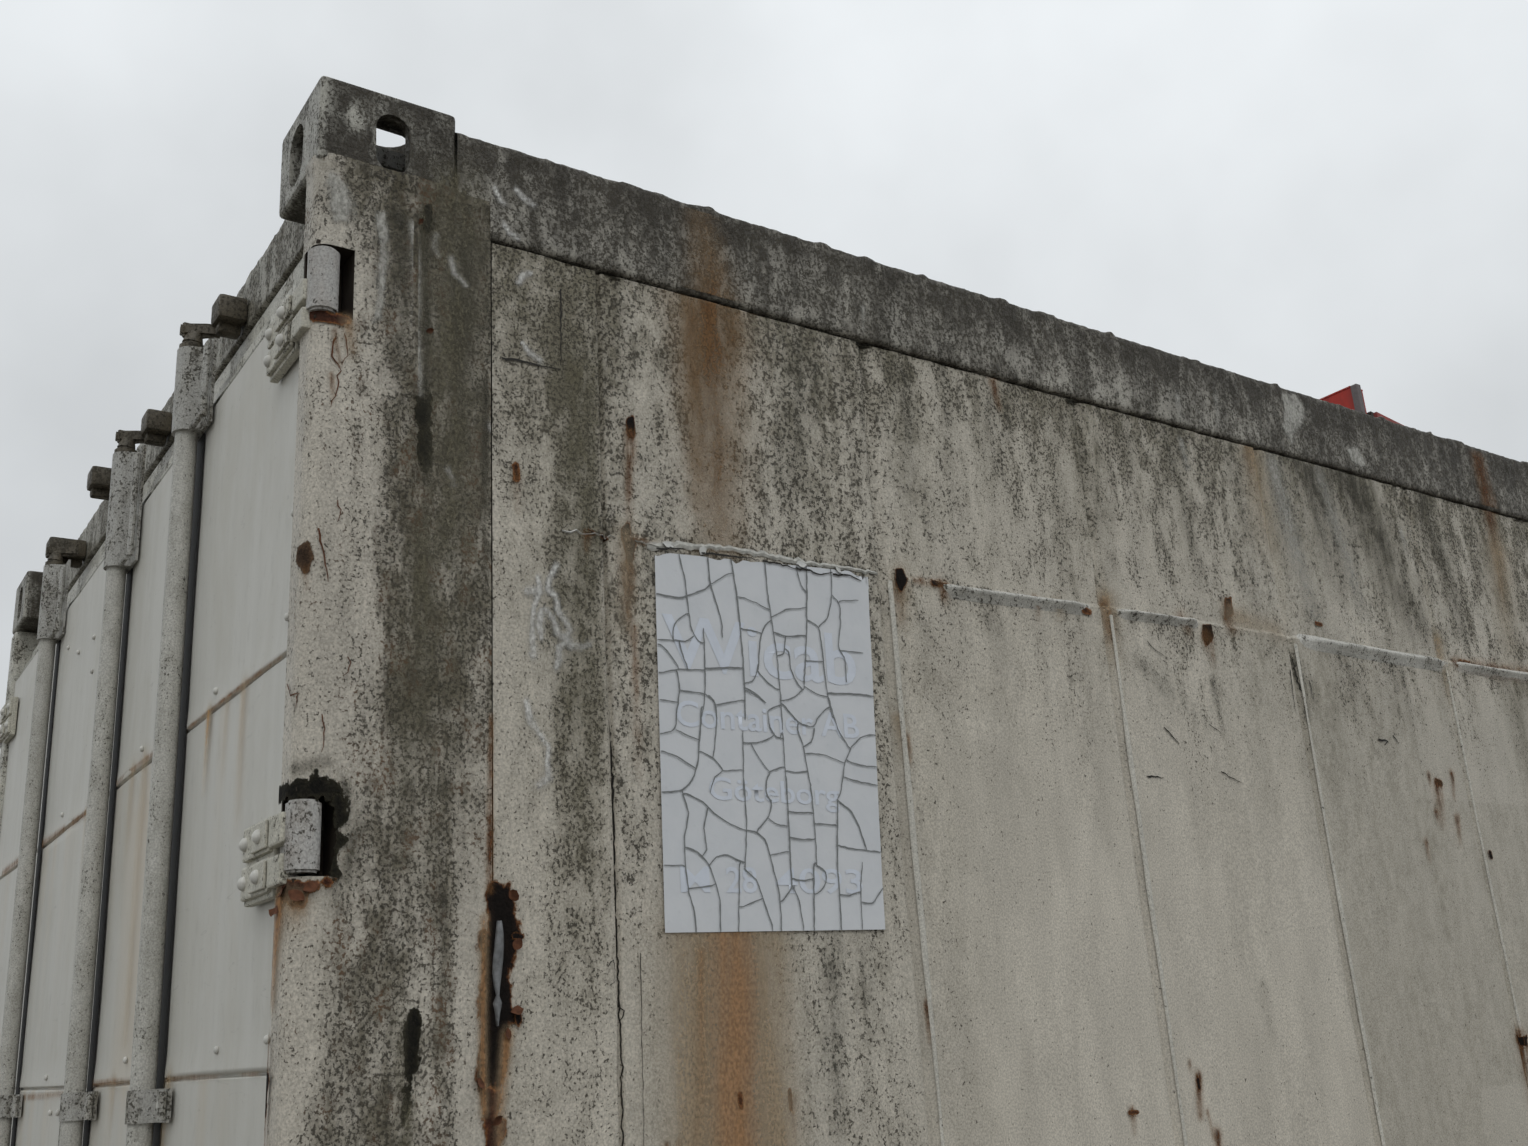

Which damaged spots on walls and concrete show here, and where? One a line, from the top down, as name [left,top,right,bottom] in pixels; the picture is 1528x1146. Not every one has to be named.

water stain [392,173,488,613]
corrosion [296,540,314,574]
water stain [1269,393,1426,626]
crack [524,529,883,932]
corrosion [1428,771,1460,833]
corrosion [269,876,337,996]
corrosion [666,931,794,1146]
corrosion [1189,1062,1202,1116]
corrosion [1516,1030,1528,1073]